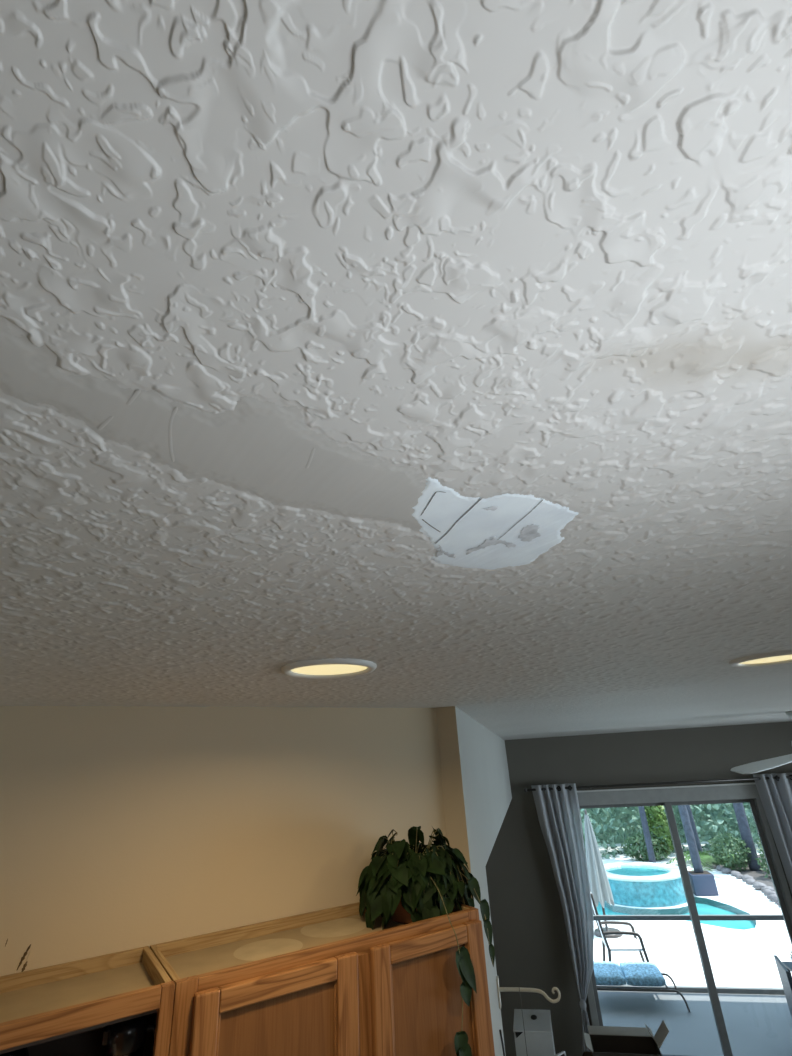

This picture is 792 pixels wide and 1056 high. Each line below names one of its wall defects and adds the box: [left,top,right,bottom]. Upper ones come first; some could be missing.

peeling [412,477,578,570]